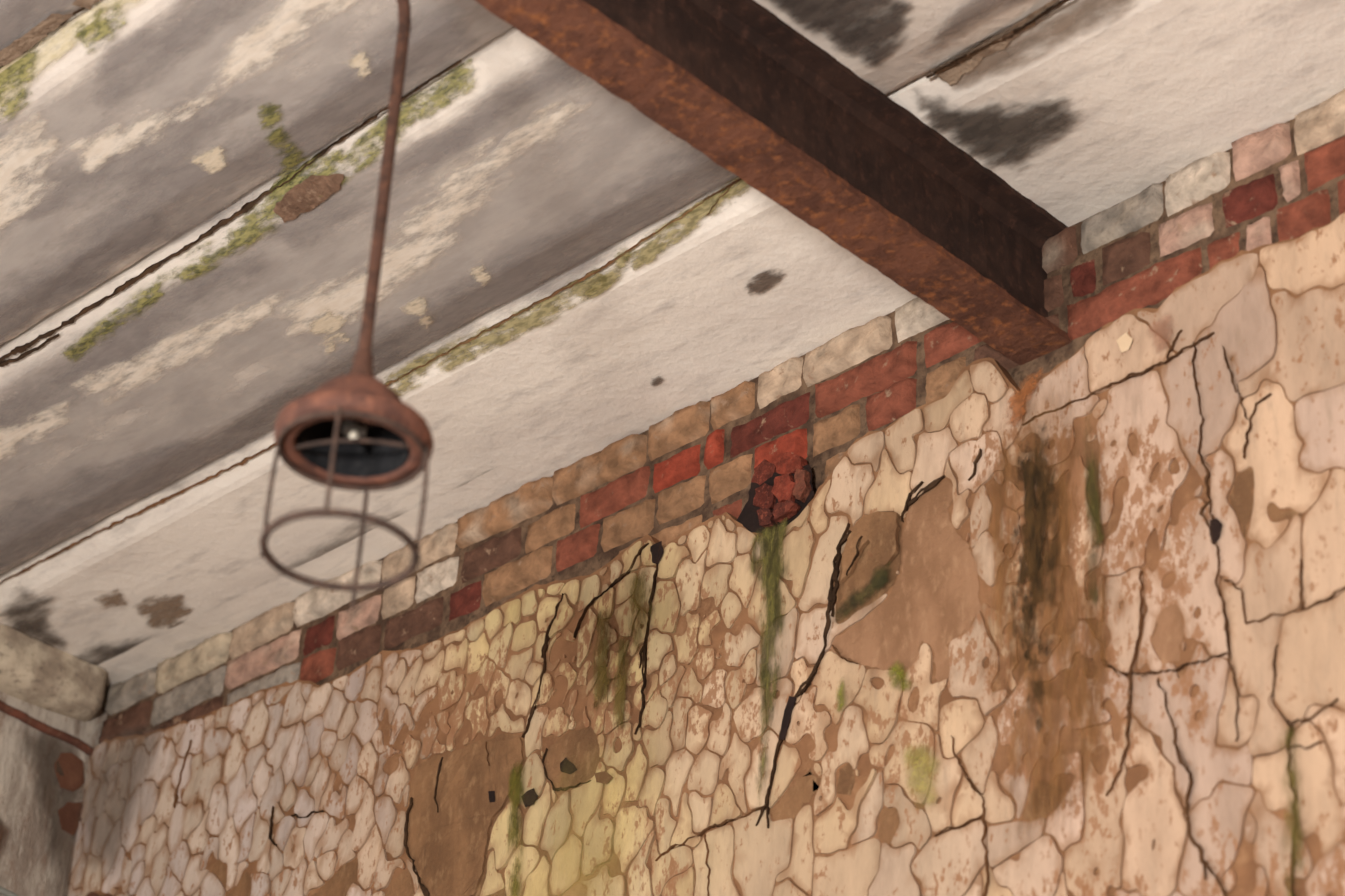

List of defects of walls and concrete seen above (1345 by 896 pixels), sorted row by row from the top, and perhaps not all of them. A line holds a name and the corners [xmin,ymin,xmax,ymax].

leakage [771,0,910,66]
leakage [0,0,749,568]
leakage [921,101,1075,166]
flaking render [1042,89,1345,341]
leakage [3,595,64,646]
peeling [385,733,526,896]
flaking render [99,297,1019,744]
peeling [542,727,613,791]
crack [521,543,660,738]
crack [655,523,850,896]
crack [934,736,990,896]
crack [1022,330,1345,896]